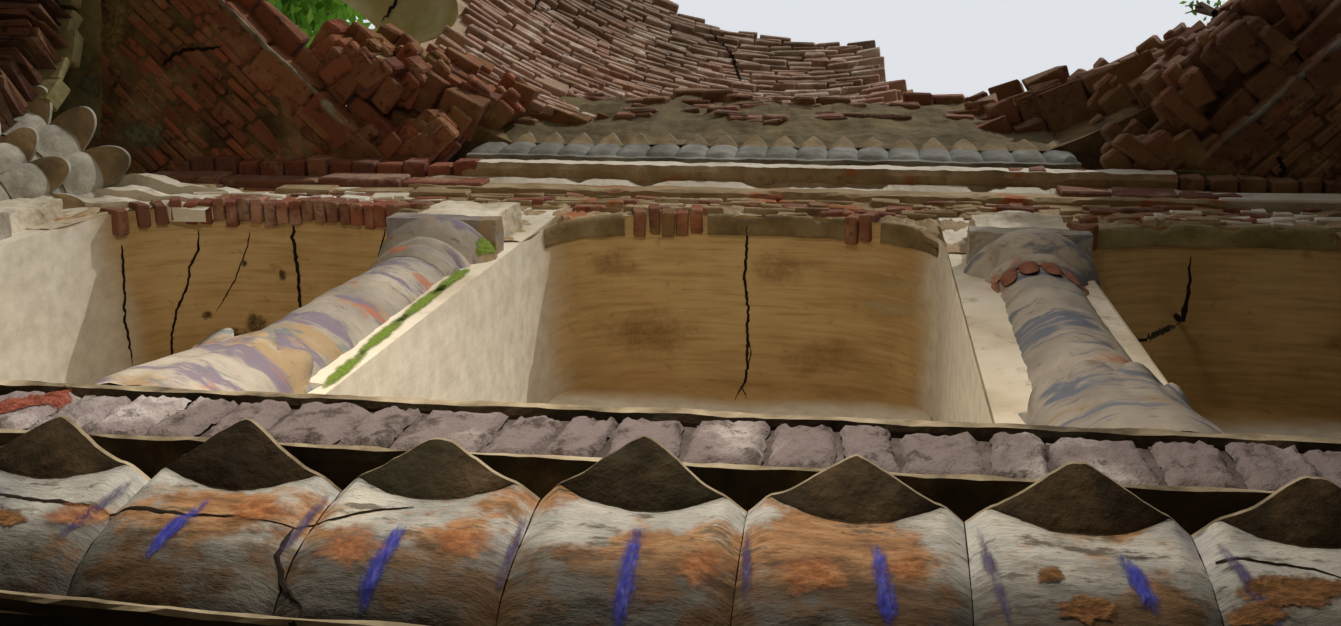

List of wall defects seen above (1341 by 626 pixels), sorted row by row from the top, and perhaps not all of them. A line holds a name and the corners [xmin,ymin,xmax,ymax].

crack [382,0,398,22]
crack [121,245,133,366]
crack [170,231,200,355]
crack [214,232,250,315]
leakage [234,315,265,337]
crack [290,226,302,308]
crack [735,225,752,400]
crack [1137,256,1192,342]
crack [0,493,414,626]
corrosion [322,523,382,561]
corrosion [785,559,840,590]
crack [1215,557,1341,578]